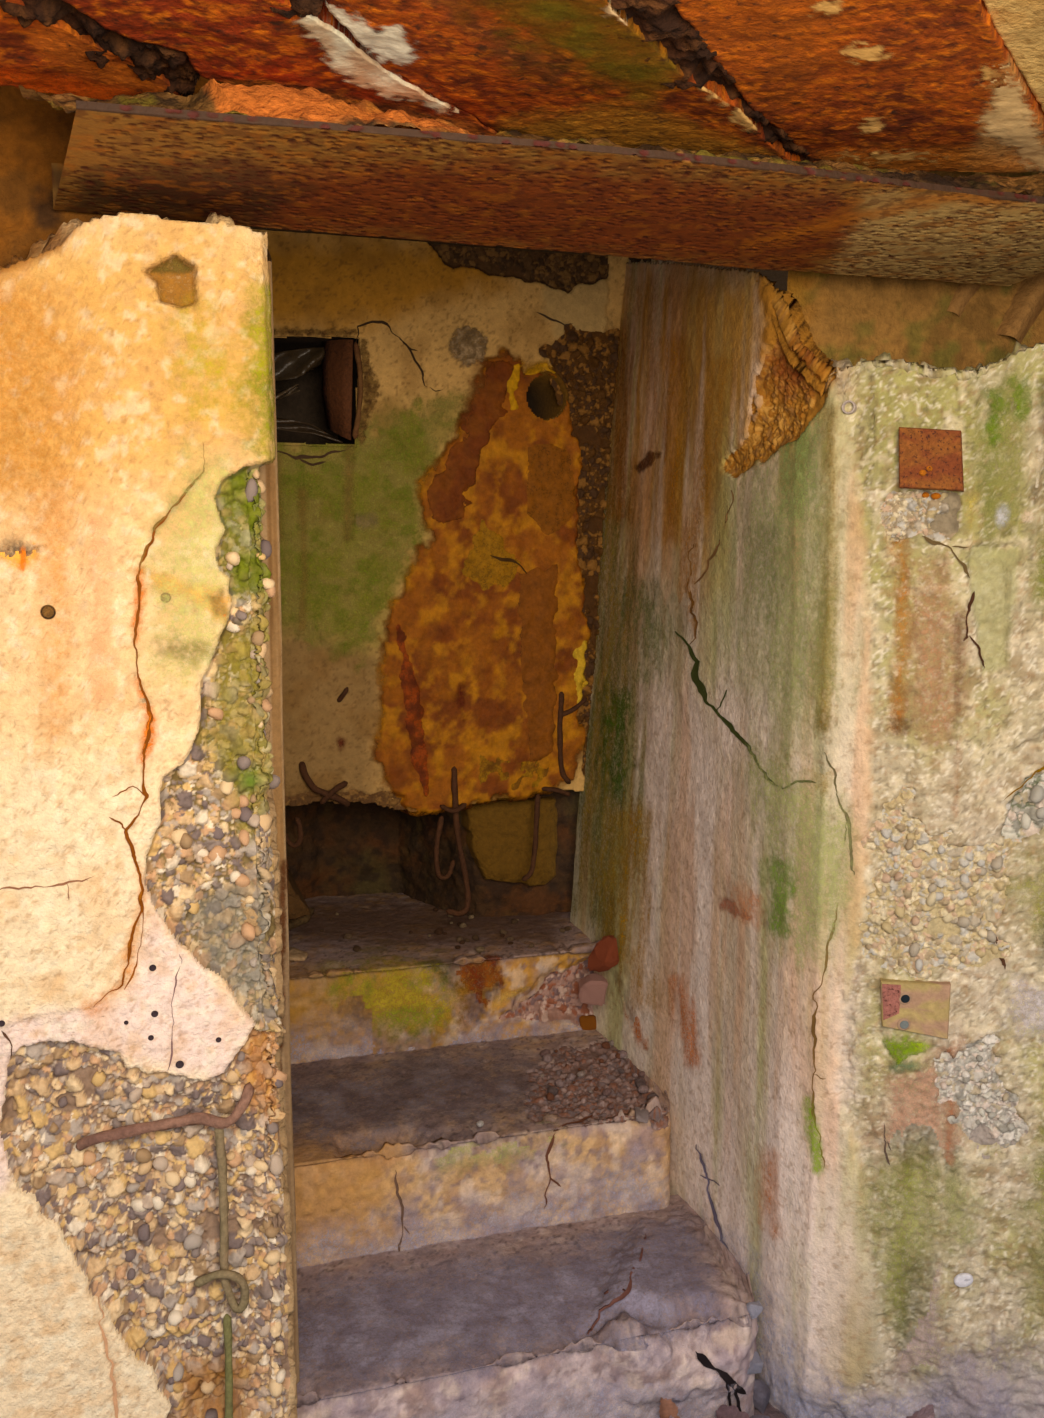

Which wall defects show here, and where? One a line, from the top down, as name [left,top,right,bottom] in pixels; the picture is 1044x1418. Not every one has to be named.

rust [0,71,138,100]
peeling [841,42,891,61]
peeling [977,65,1044,171]
crack [95,444,205,1005]
rust [373,348,591,817]
crack [674,490,855,875]
damp [817,573,835,730]
crack [922,536,985,668]
crack [0,876,94,899]
spalling [0,463,409,1418]
crack [811,905,838,1169]
spalling [858,773,1044,980]